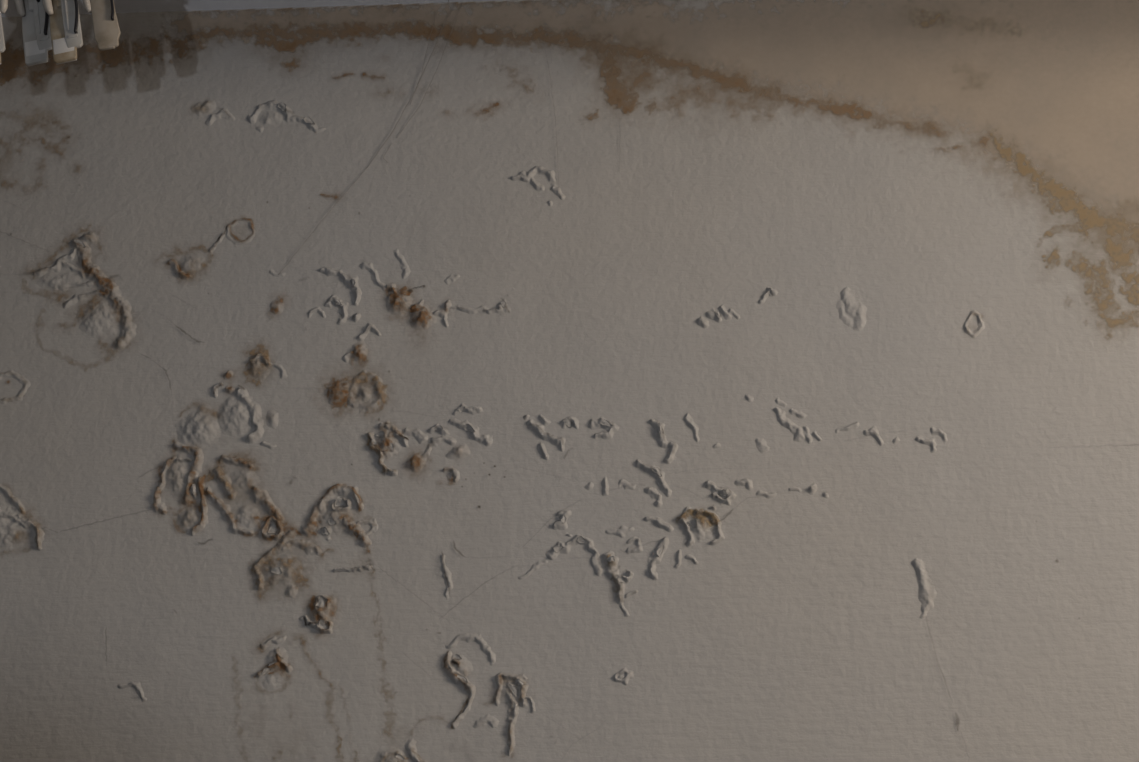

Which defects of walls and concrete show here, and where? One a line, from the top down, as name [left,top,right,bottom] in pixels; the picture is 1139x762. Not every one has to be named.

water stain [0,0,1139,337]
peeling [307,262,389,342]
peeling [518,413,829,617]
crack [911,558,937,619]
peeling [441,633,536,757]